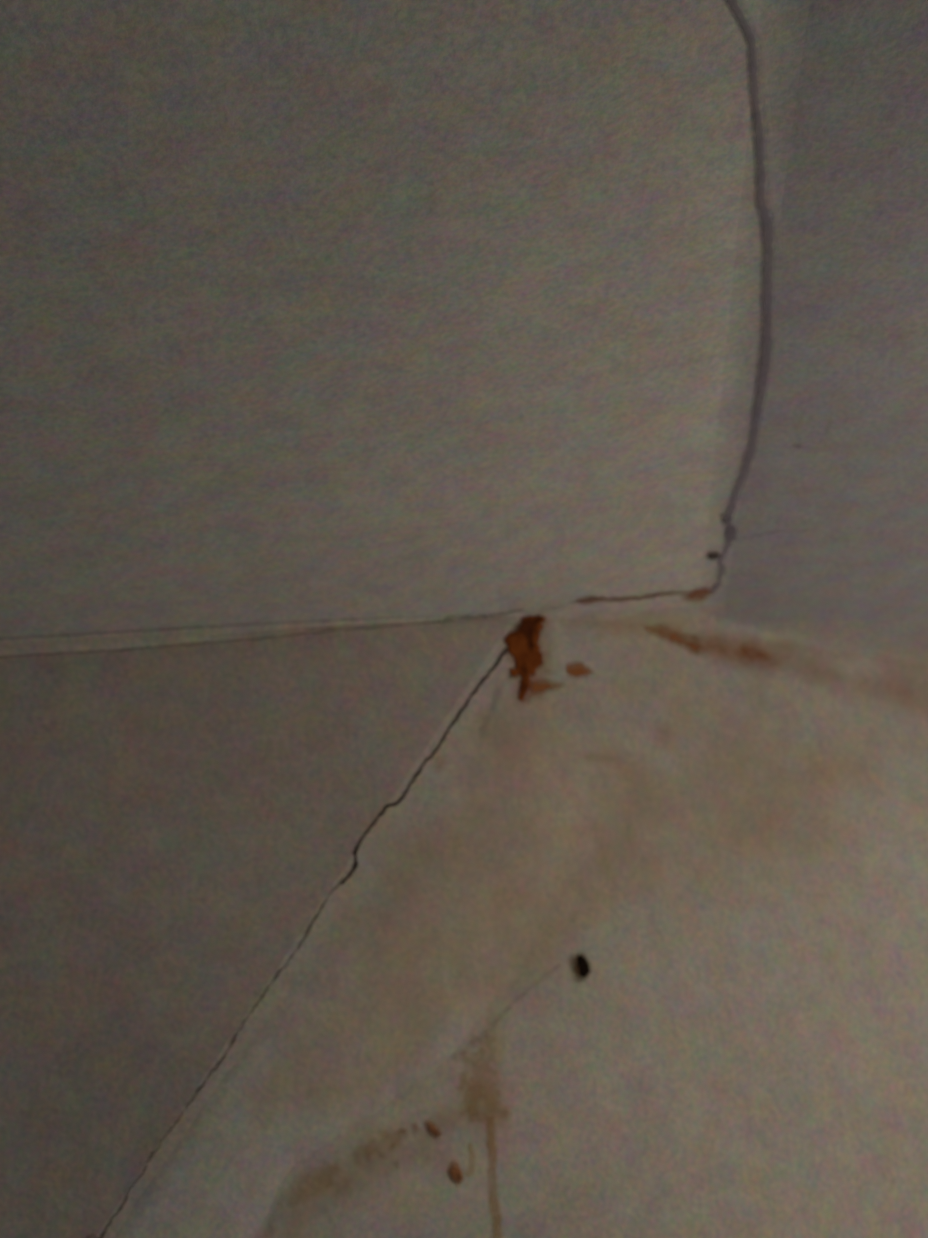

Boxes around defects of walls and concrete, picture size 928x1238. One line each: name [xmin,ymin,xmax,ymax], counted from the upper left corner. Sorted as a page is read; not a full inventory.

crack [708,0,773,593]
rust [505,615,555,701]
rust [567,664,592,677]
crack [261,648,508,997]
rust [450,1163,463,1184]